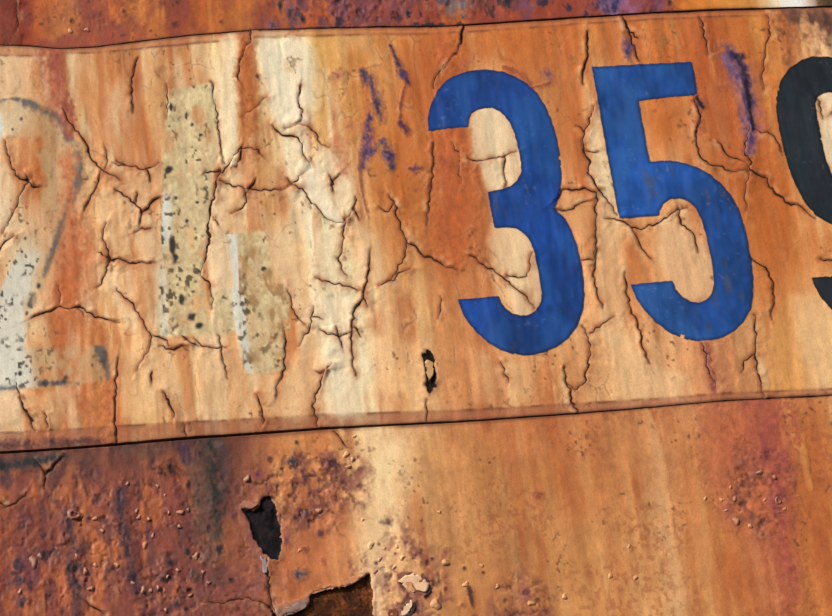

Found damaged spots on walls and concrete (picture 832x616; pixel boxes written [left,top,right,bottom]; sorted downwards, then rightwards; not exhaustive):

crack [64,112,160,232]
crack [200,86,456,386]
rust [231,0,483,164]
rust [321,42,487,275]
crack [557,105,698,299]
crack [99,222,227,438]
peeling [422,349,437,393]
rust [106,454,309,616]
peeling [240,496,282,574]
rust [248,439,353,585]
peeling [272,574,373,616]
rust [685,336,815,616]